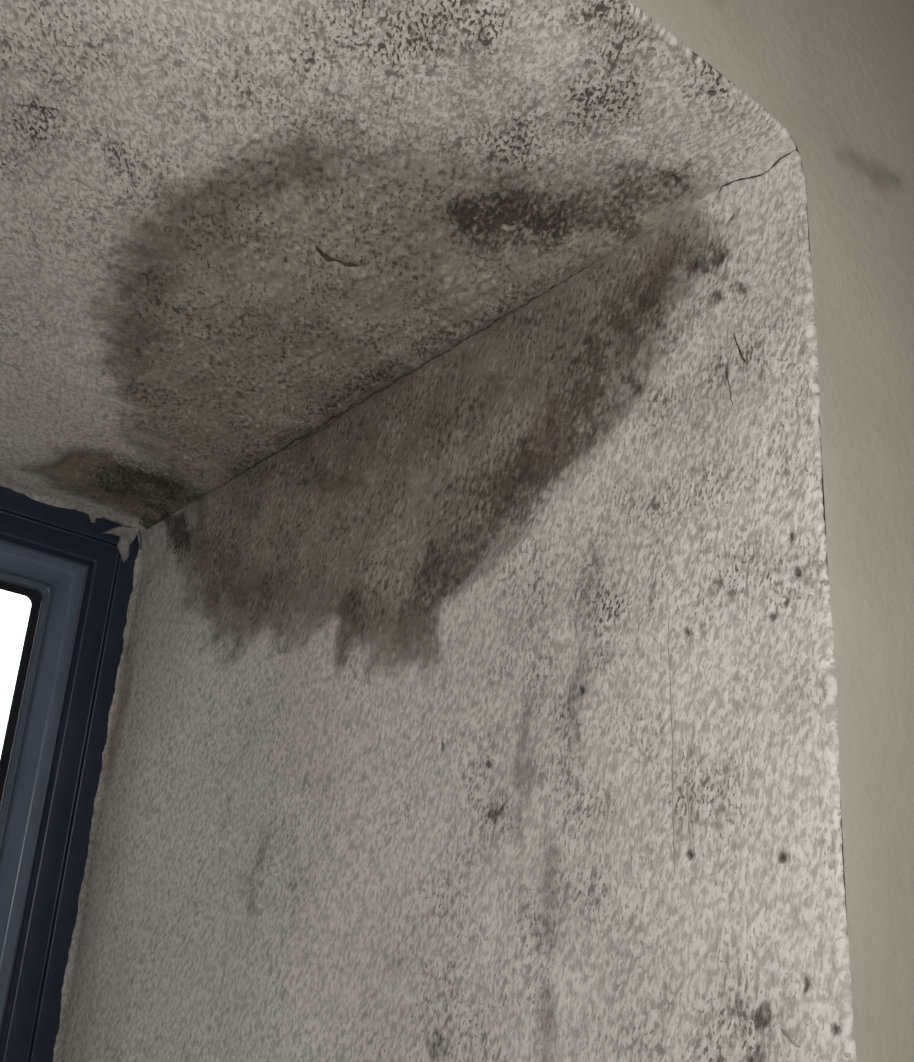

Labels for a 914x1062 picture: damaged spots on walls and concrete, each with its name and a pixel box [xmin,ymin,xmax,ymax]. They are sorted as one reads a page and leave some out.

water stain [36,147,729,664]
crack [715,149,796,198]